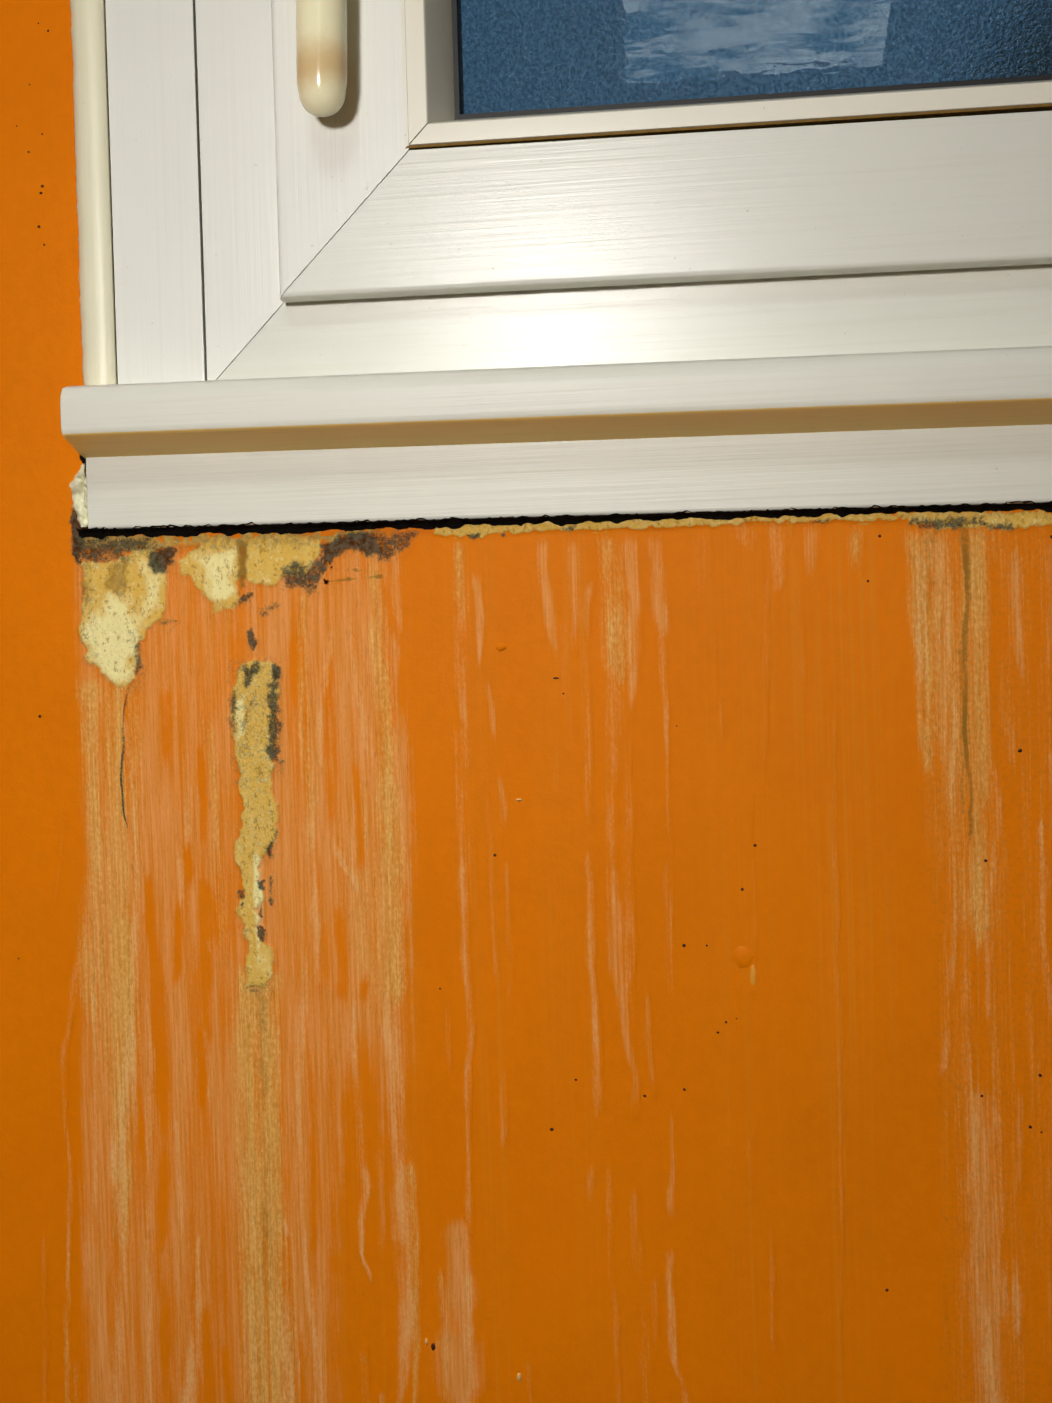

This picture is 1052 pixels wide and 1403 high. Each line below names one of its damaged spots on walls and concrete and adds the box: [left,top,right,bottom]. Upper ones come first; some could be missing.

crack [119,689,129,837]
peeling [74,533,323,694]
peeling [225,656,287,1002]
leakage [40,501,1052,1403]